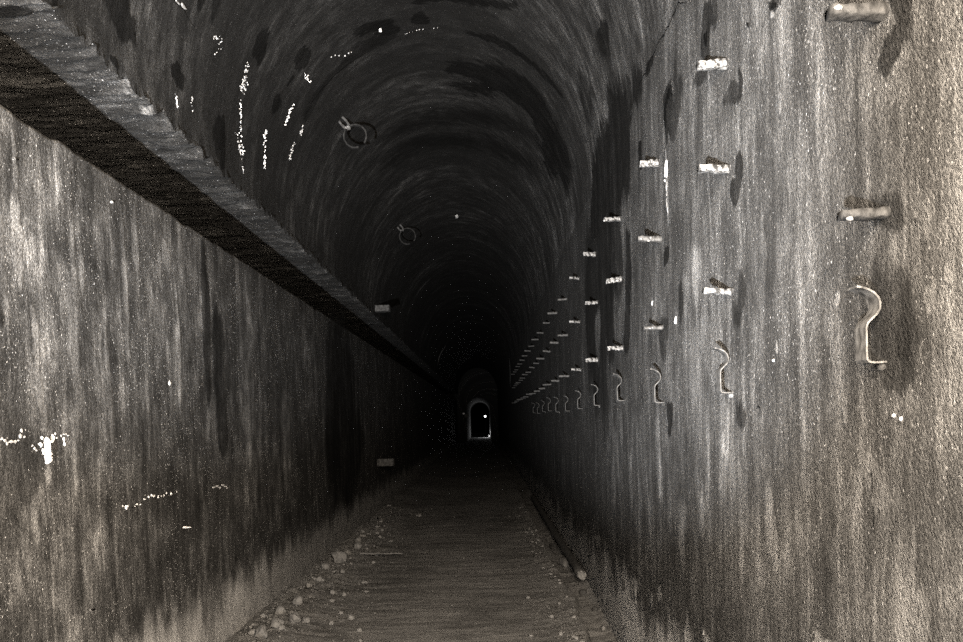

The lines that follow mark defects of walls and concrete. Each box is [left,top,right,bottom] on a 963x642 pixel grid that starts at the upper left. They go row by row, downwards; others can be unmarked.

damp [0,189,23,345]
damp [0,221,85,581]